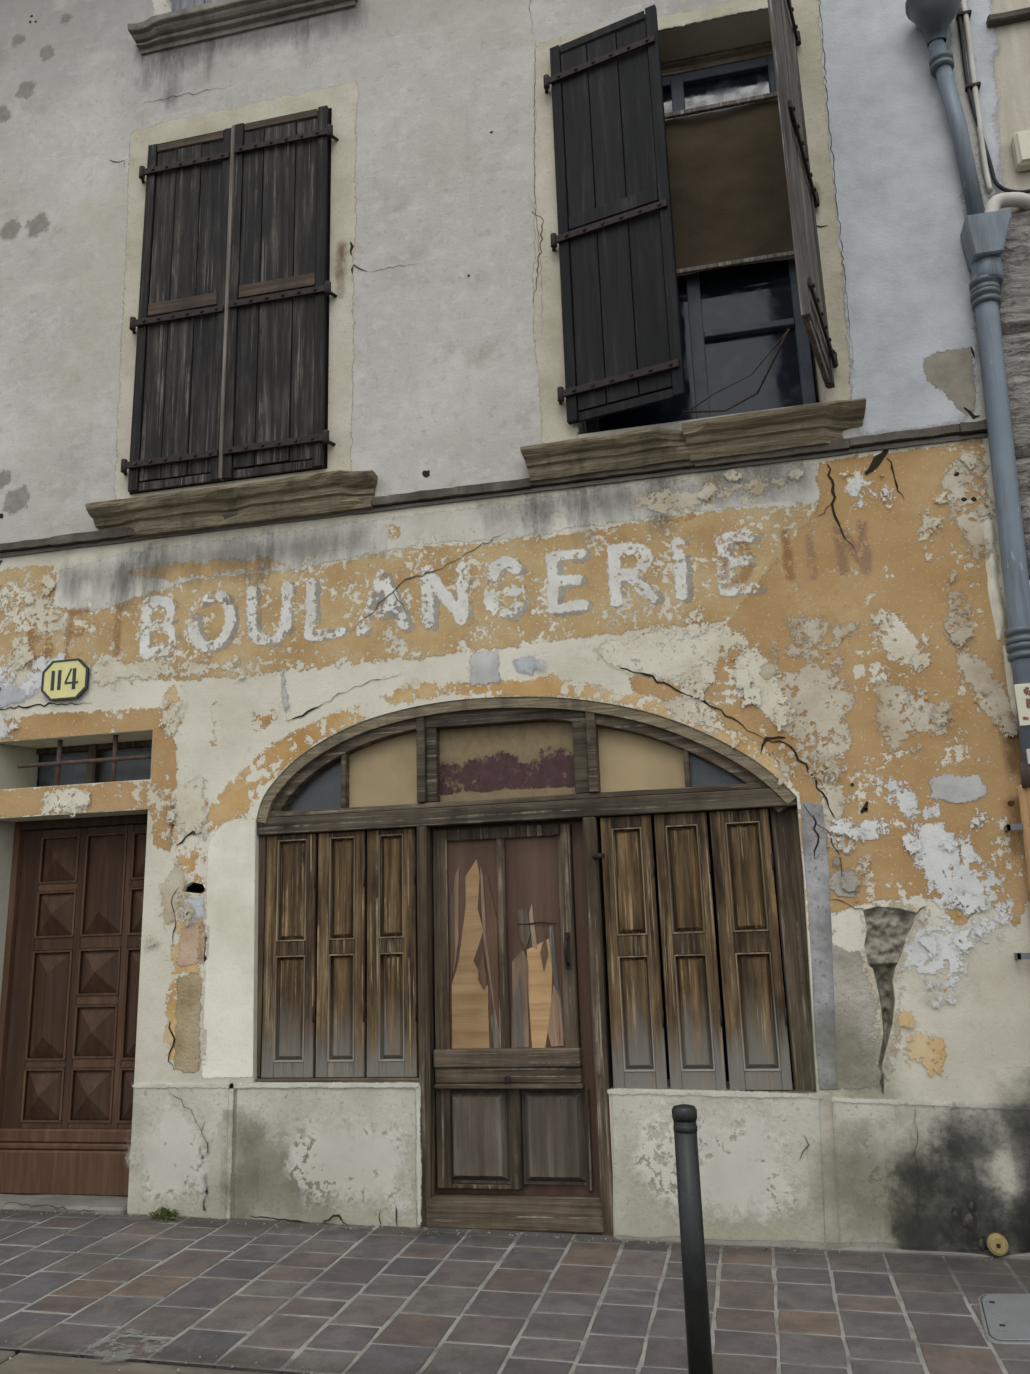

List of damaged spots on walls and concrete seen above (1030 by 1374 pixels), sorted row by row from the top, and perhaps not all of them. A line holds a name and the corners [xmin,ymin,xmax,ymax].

water stain [0,213,49,239]
spalling [923,346,980,419]
water stain [0,471,29,513]
crack [818,464,856,553]
peeling [915,450,997,570]
crack [350,533,504,632]
crack [0,702,82,710]
peeling [39,785,91,818]
crack [621,668,845,893]
flaking render [592,569,1019,1094]
peeling [143,776,210,1074]
water stain [854,1099,1030,1258]